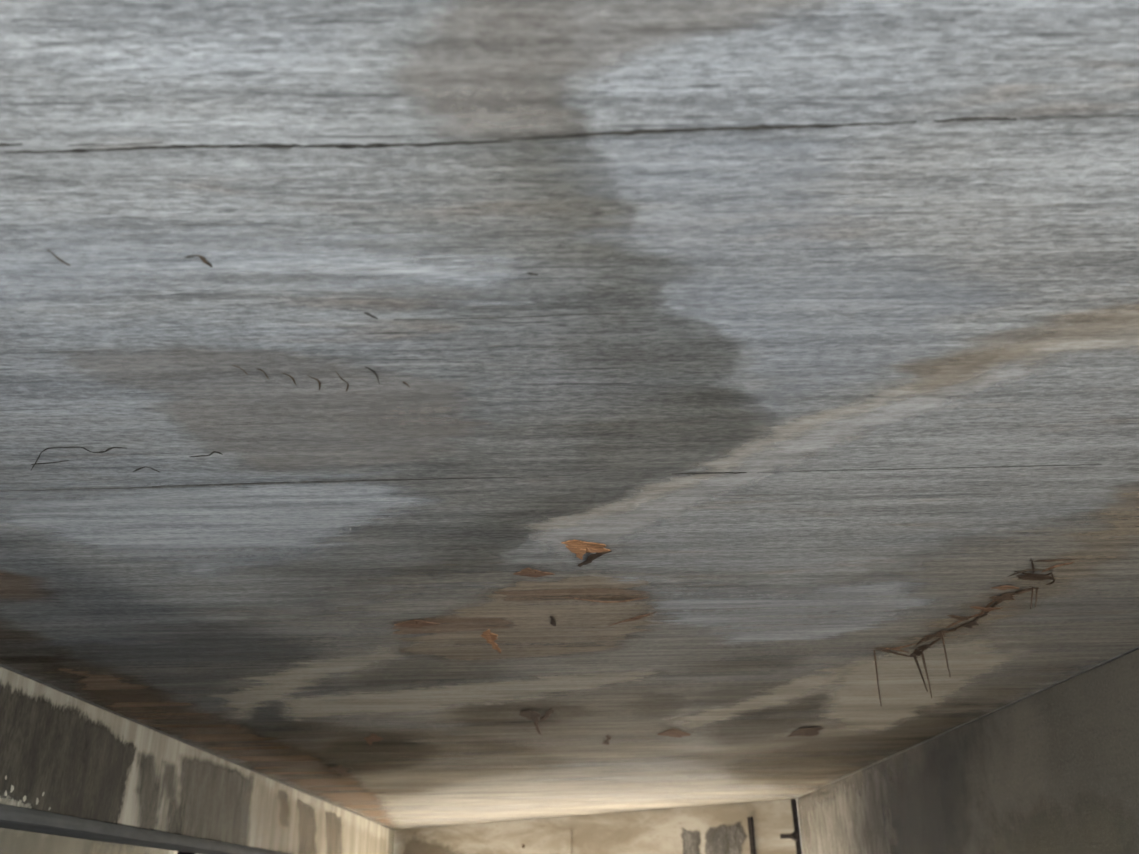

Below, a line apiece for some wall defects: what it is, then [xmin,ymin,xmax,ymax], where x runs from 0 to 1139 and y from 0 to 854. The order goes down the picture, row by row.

crack [0,115,1139,153]
damp [0,250,512,290]
crack [0,447,549,492]
crack [677,464,1102,474]
peeling [565,545,612,567]
damp [0,307,1139,854]